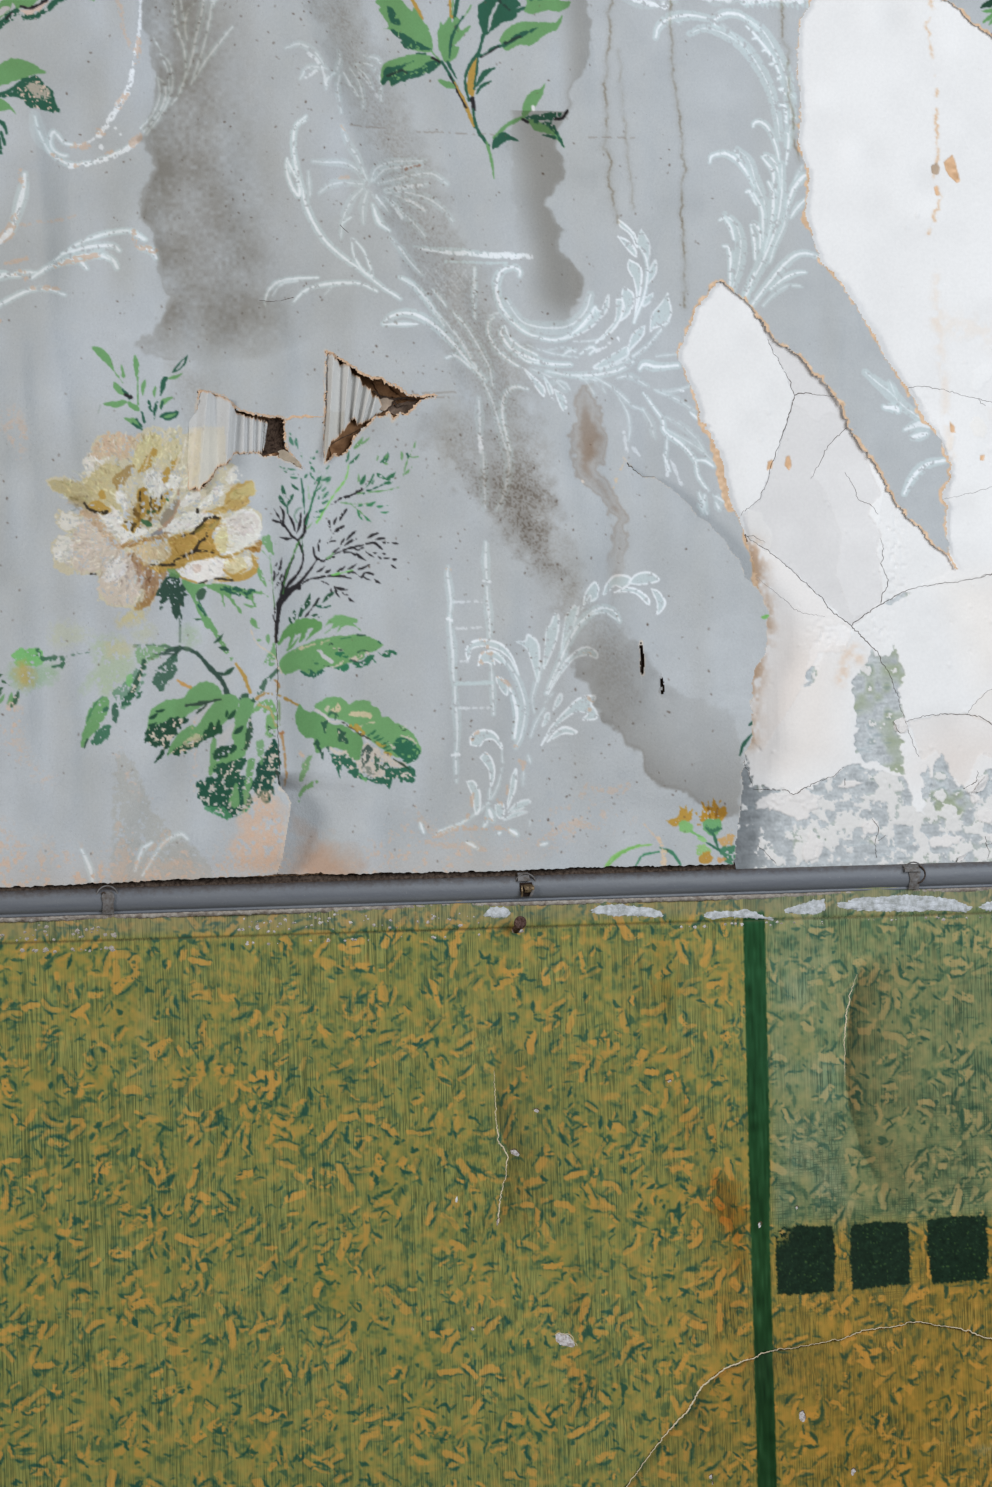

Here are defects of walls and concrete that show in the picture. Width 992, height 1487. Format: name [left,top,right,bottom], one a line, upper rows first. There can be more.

water stain [133,0,313,366]
water stain [505,0,637,329]
flaking render [931,154,960,196]
peeling [515,466,992,869]
peeling [746,301,957,569]
crack [741,344,992,756]
crack [493,1073,509,1223]
crack [625,1321,992,1487]